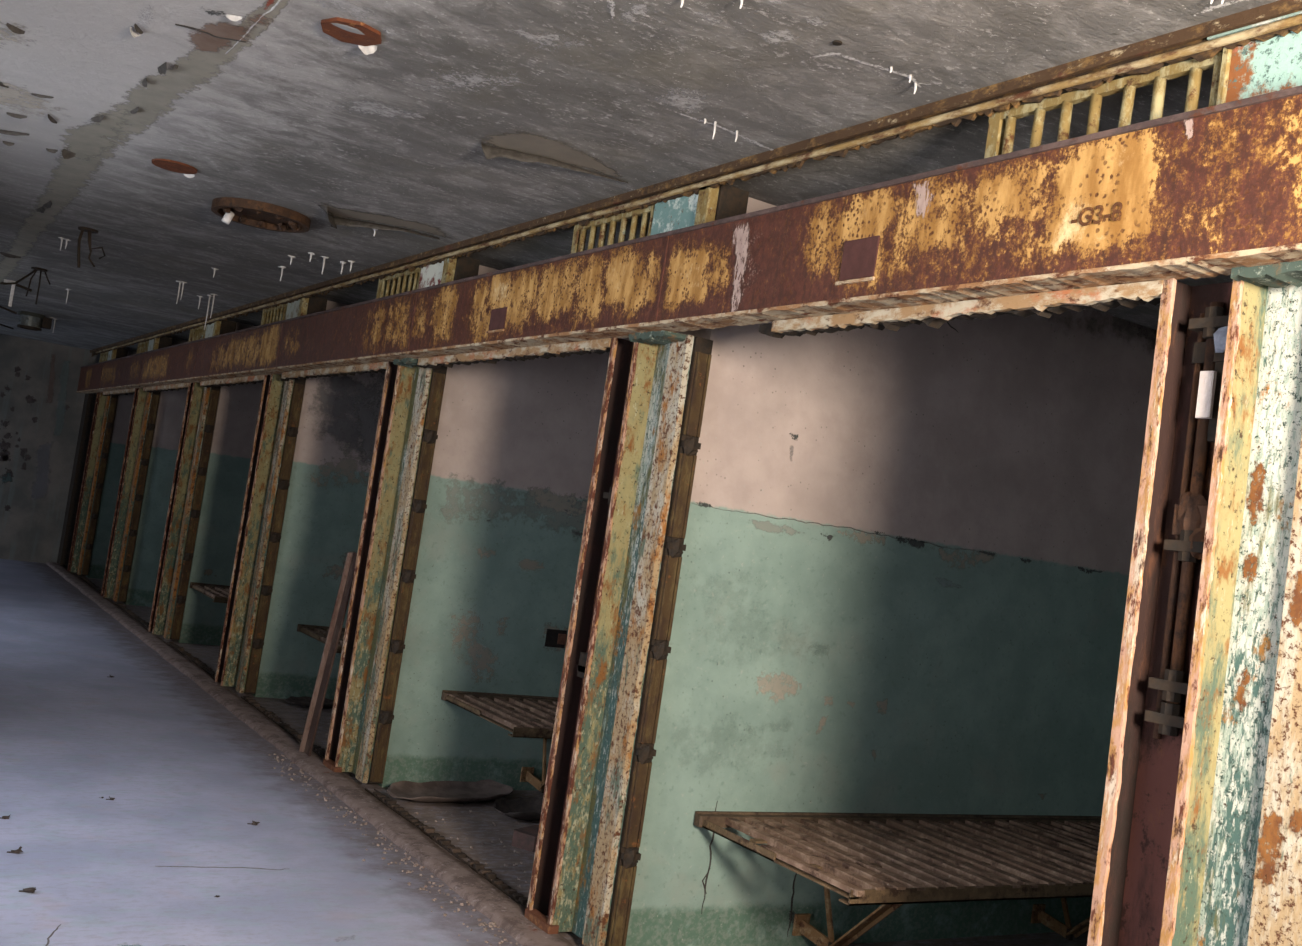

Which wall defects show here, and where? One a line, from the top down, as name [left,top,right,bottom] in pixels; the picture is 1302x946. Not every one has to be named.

flaking render [0,0,289,282]
corrosion [1246,461,1266,525]
peeling [692,502,997,588]
corrosion [1243,553,1259,582]
corrosion [1288,571,1302,627]
corrosion [1235,667,1251,712]
crack [701,801,718,915]
corrosion [1254,808,1302,887]